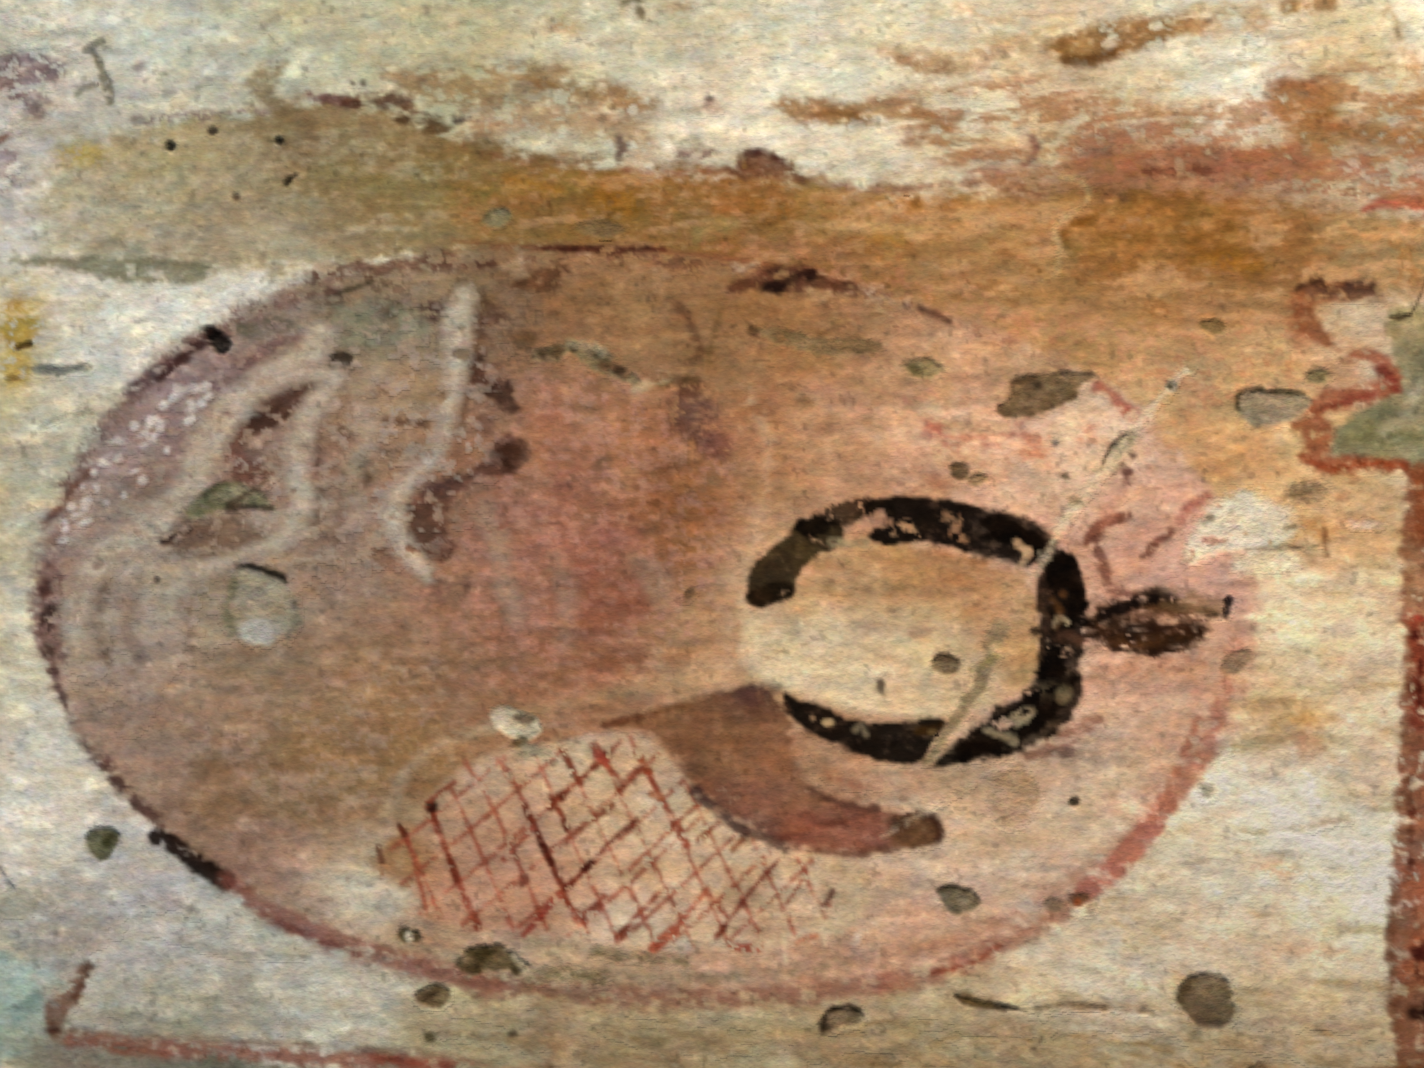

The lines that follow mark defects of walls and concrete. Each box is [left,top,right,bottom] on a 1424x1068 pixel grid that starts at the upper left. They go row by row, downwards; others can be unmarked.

spalling [994,368,1101,422]
spalling [1230,366,1336,434]
spalling [1050,436,1063,449]
spalling [1056,469,1072,483]
spalling [217,560,304,649]
spalling [1170,970,1242,1035]
spalling [1245,1059,1272,1068]